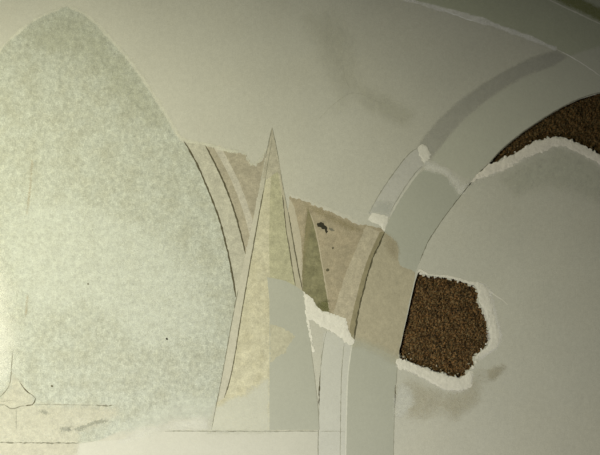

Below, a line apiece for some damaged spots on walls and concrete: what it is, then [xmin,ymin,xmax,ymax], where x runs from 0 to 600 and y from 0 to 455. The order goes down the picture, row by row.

spalling [471,92,600,185]
spalling [396,269,508,394]